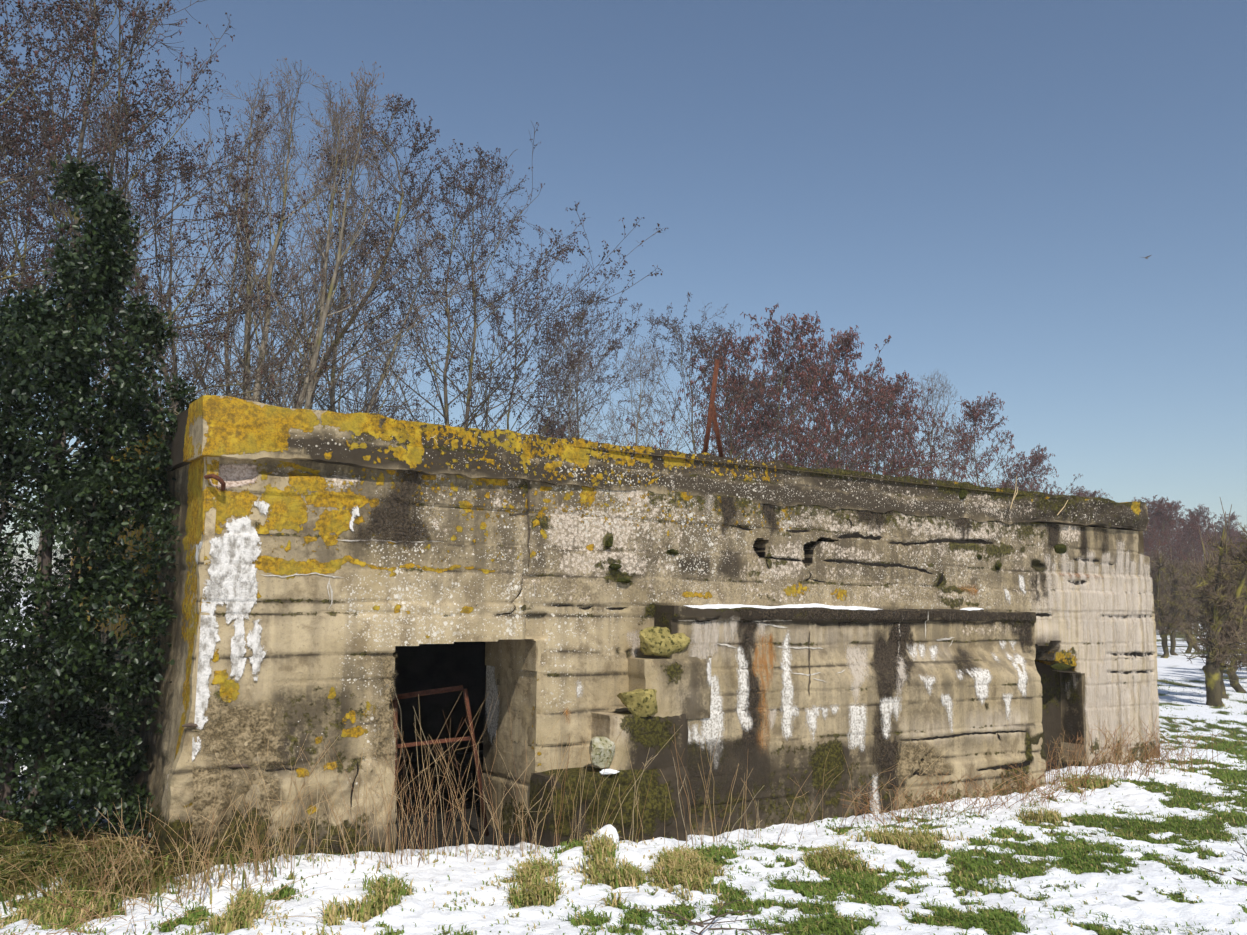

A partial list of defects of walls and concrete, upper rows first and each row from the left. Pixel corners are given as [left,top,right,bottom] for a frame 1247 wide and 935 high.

spalling [801,537,838,566]
crack [766,519,993,587]
crack [898,615,954,653]
corrosion [752,634,776,753]
leakage [687,524,1159,814]